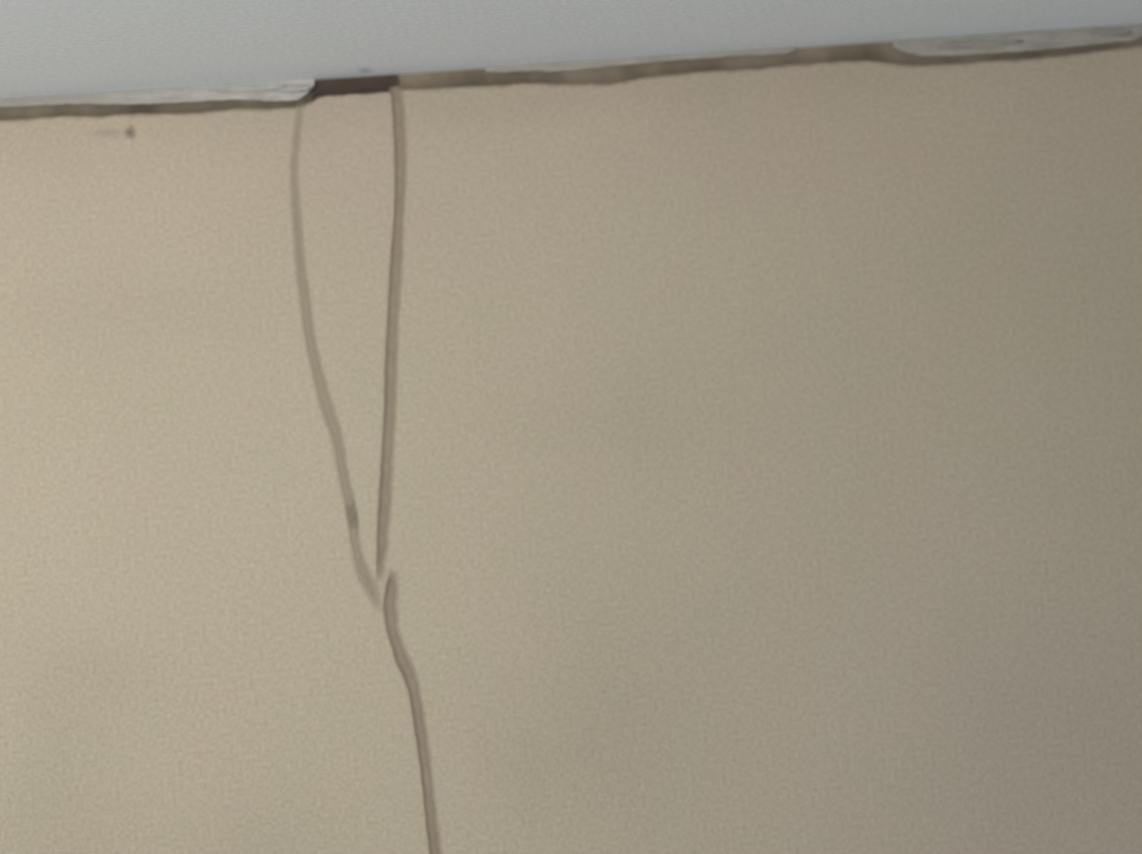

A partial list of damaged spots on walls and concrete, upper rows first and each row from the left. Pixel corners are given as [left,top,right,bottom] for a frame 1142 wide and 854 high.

crack [0,88,313,121]
crack [293,37,1142,854]